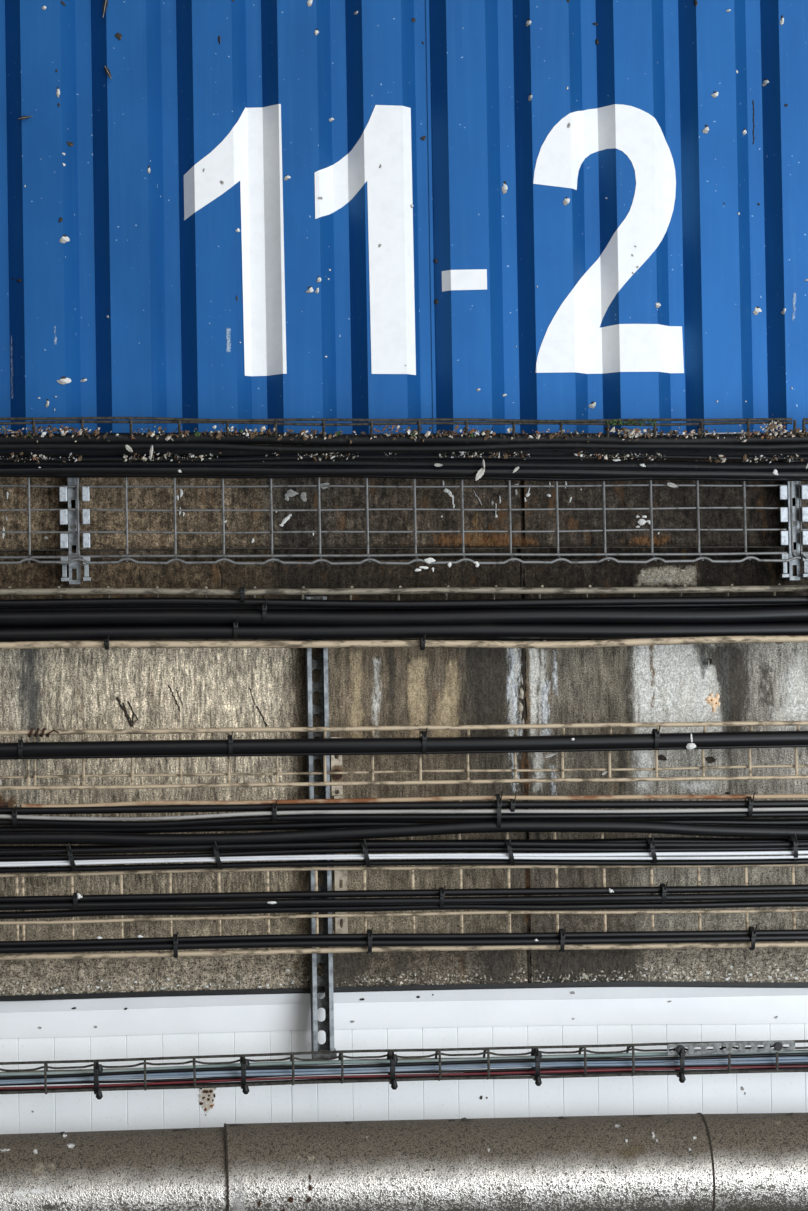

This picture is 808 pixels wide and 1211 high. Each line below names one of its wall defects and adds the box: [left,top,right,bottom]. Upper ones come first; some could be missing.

leakage [348,647,558,738]
leakage [509,752,557,795]